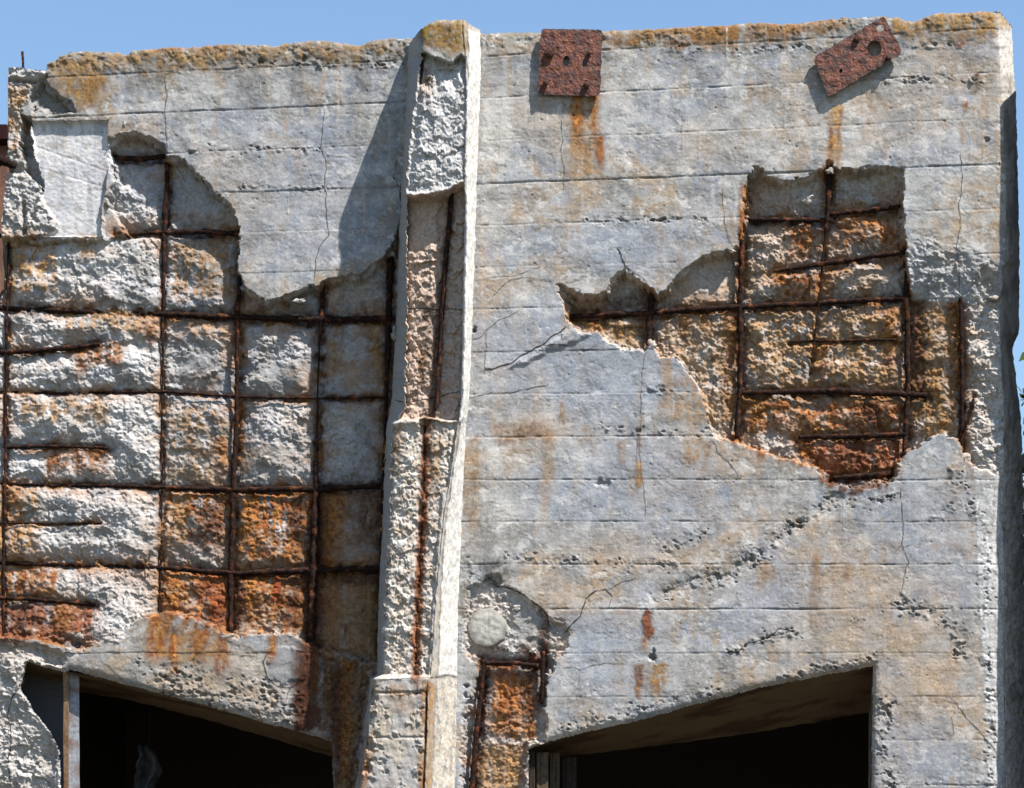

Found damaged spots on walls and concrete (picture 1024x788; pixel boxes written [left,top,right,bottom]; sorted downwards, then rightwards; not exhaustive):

rust [570,96,604,173]
rust [738,187,746,242]
rust [791,216,897,257]
spalling [0,30,573,788]
crack [396,266,602,404]
spalling [555,159,1006,788]
rust [665,301,959,494]
rust [147,491,377,788]
rust [411,420,437,788]
crack [485,573,636,635]
rust [642,609,655,647]
rust [634,663,665,697]